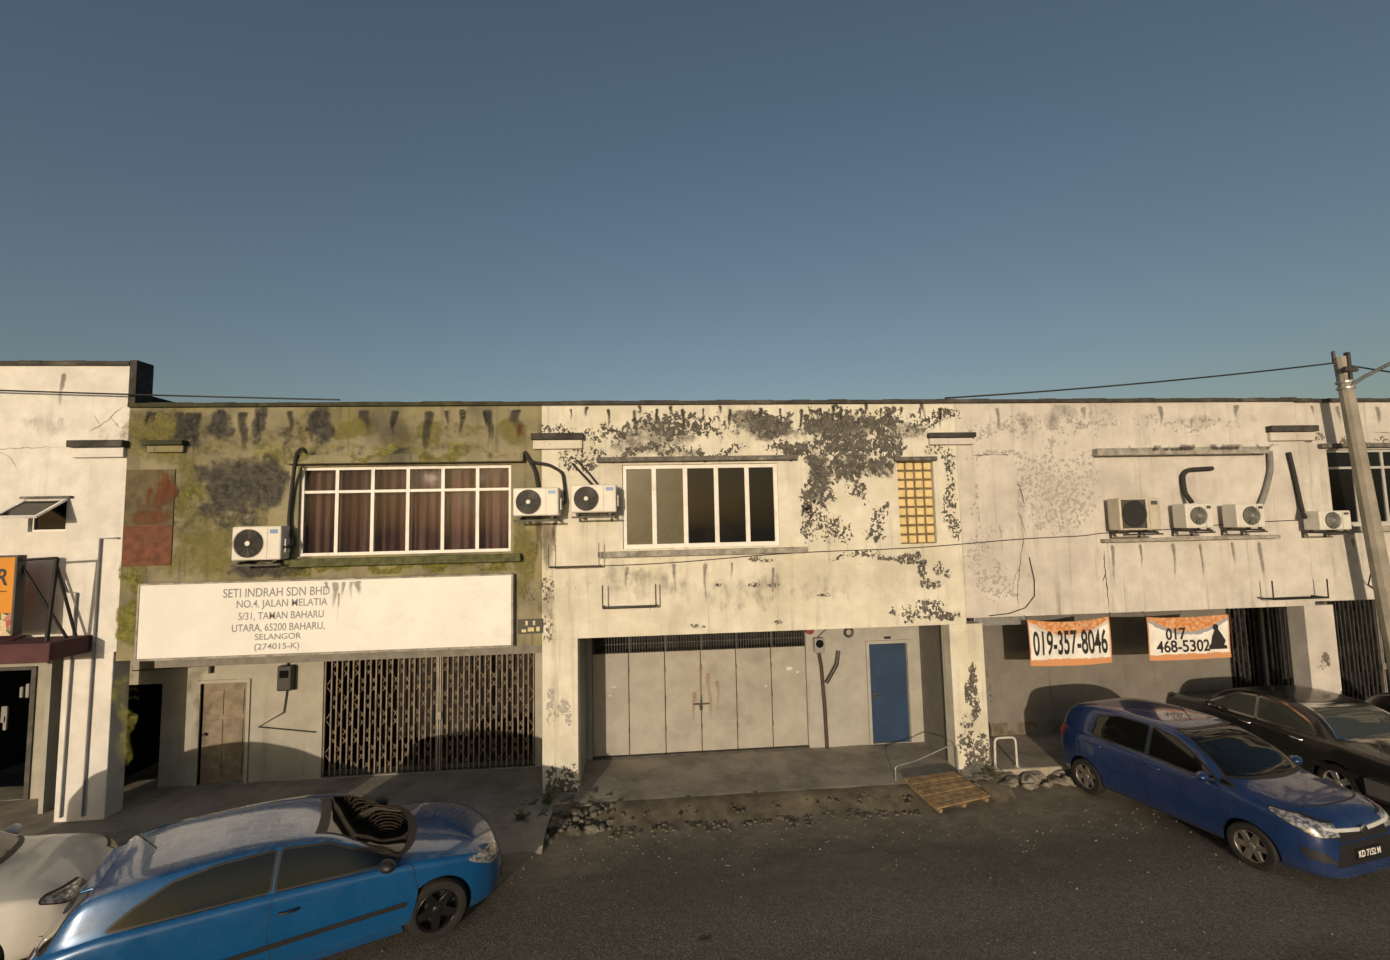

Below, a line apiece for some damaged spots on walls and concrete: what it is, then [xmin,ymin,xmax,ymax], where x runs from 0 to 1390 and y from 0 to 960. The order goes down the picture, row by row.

damp [145,407,290,527]
damp [285,408,334,442]
damp [423,410,466,447]
damp [483,410,492,433]
peeling [537,404,1235,624]
crack [973,454,1027,614]
spalling [957,662,993,769]